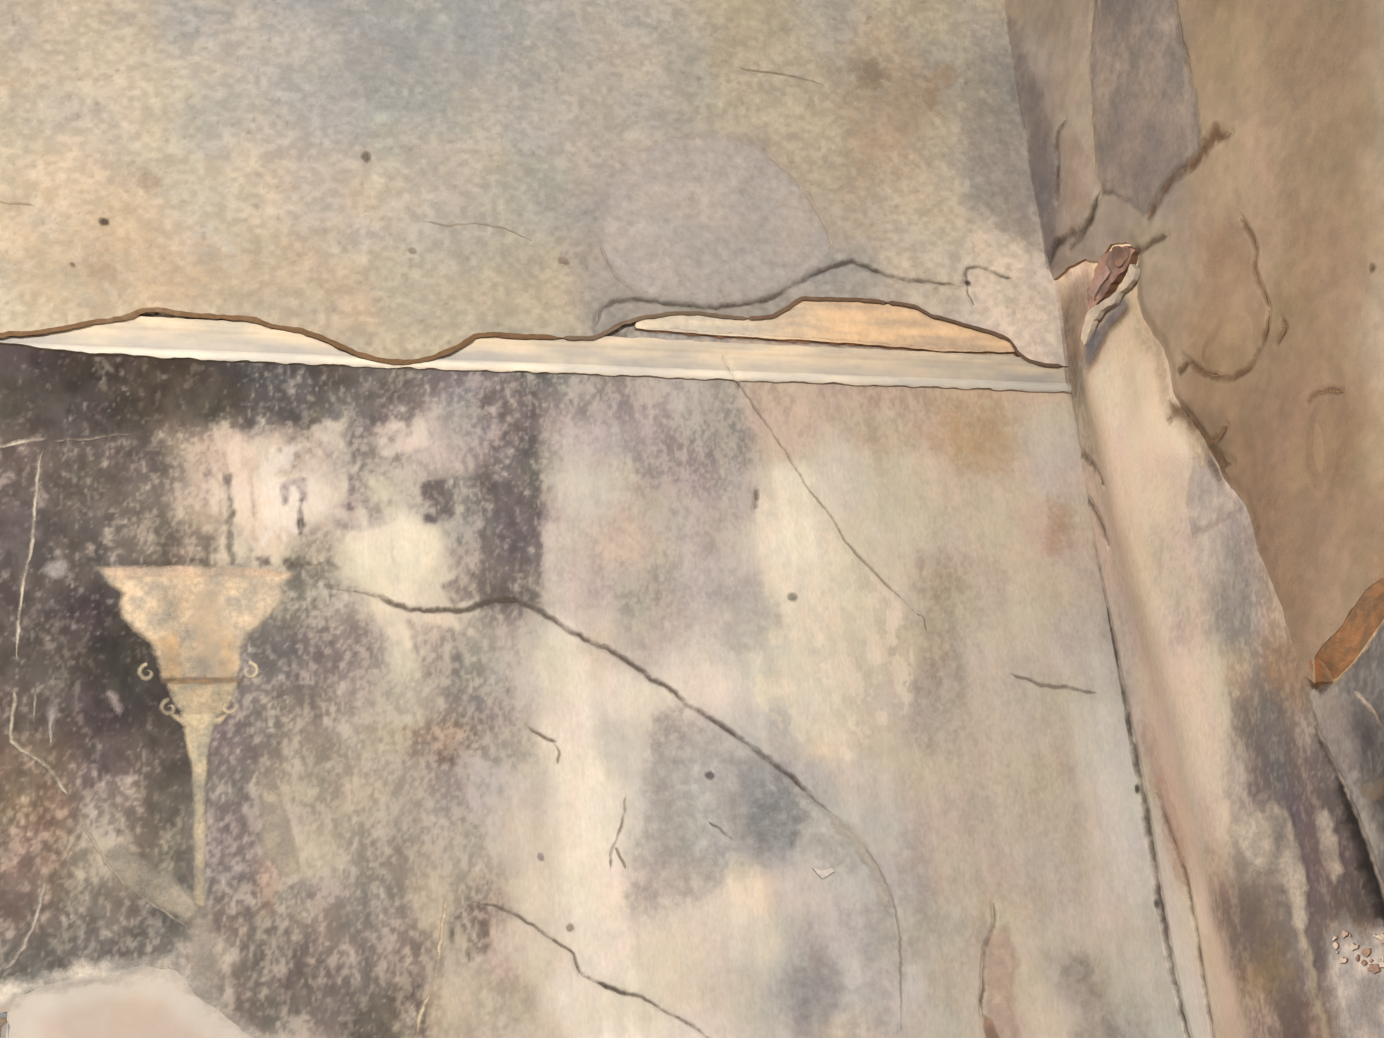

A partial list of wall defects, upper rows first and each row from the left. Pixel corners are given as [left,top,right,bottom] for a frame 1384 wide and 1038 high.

spalling [1088,0,1199,212]
crack [0,260,1062,367]
spalling [634,300,1015,353]
spalling [1081,246,1140,345]
crack [810,491,891,590]
peeling [1186,456,1238,534]
spalling [1312,578,1384,689]
crack [384,597,804,791]
crack [610,822,625,867]
spalling [0,961,262,1038]
crack [417,901,446,1031]
crack [484,904,690,1025]